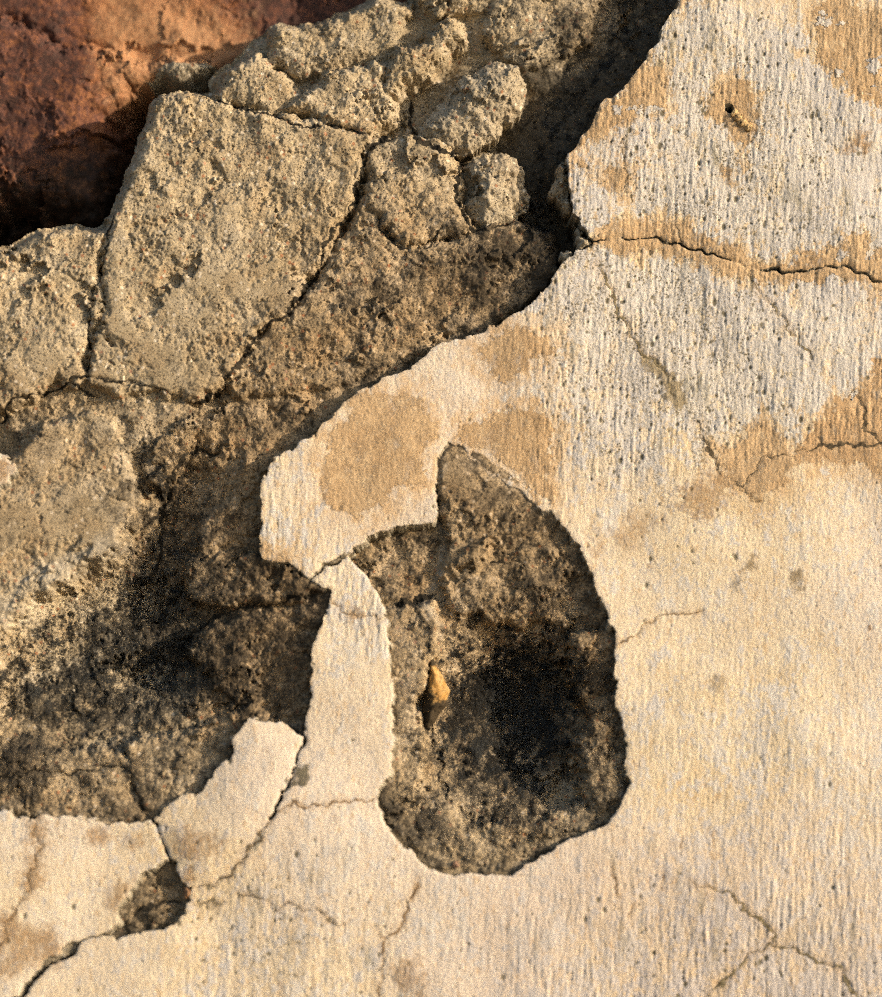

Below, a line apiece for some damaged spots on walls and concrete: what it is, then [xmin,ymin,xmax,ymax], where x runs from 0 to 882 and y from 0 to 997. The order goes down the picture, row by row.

peeling [574,63,670,150]
crack [2,98,520,424]
water stain [130,456,185,563]
crack [693,392,882,502]
water stain [0,573,234,753]
spalling [0,413,331,826]
spalling [320,389,629,876]
water stain [410,623,604,830]
crack [22,942,80,997]
spalling [113,862,191,939]
crack [138,793,375,927]
crack [692,881,858,997]